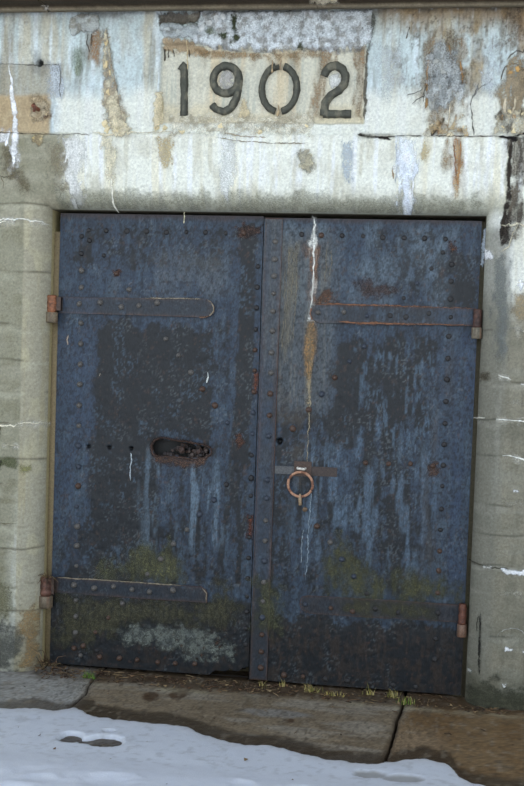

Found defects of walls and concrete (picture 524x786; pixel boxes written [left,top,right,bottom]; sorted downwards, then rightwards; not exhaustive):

flaking render [159,9,372,54]
water stain [0,70,29,191]
crack [0,217,49,225]
water stain [499,138,524,245]
corrosion [310,278,472,319]
water stain [481,228,524,355]